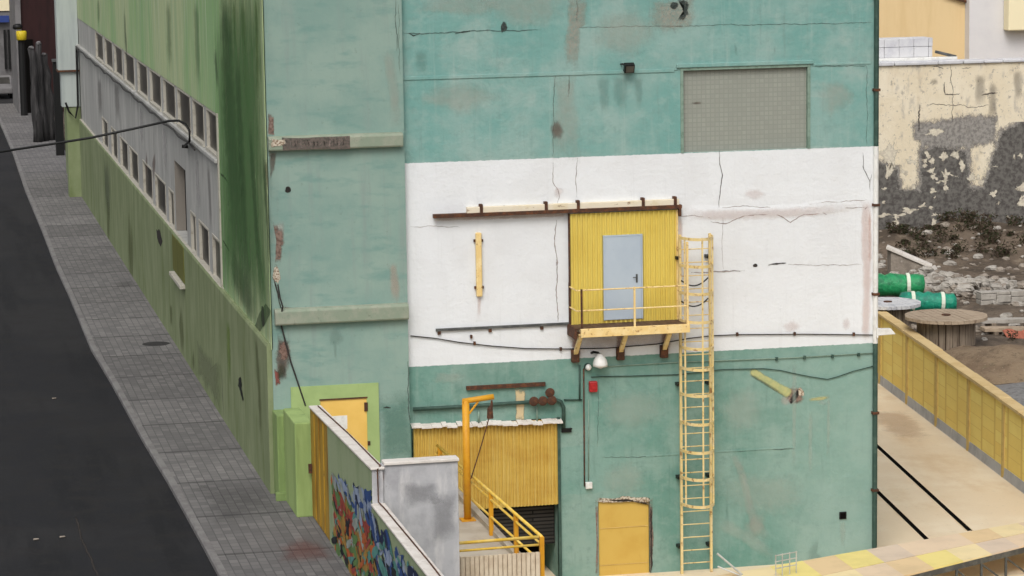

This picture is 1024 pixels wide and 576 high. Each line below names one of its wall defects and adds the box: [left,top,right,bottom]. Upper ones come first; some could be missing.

crack [395,7,528,69]
peeling [670,0,689,20]
crack [918,65,995,131]
damp [221,4,265,297]
peeling [268,115,350,150]
crack [552,83,578,317]
crack [690,65,871,273]
peeling [878,114,1024,231]
peeling [273,227,283,283]
spalling [274,341,289,385]